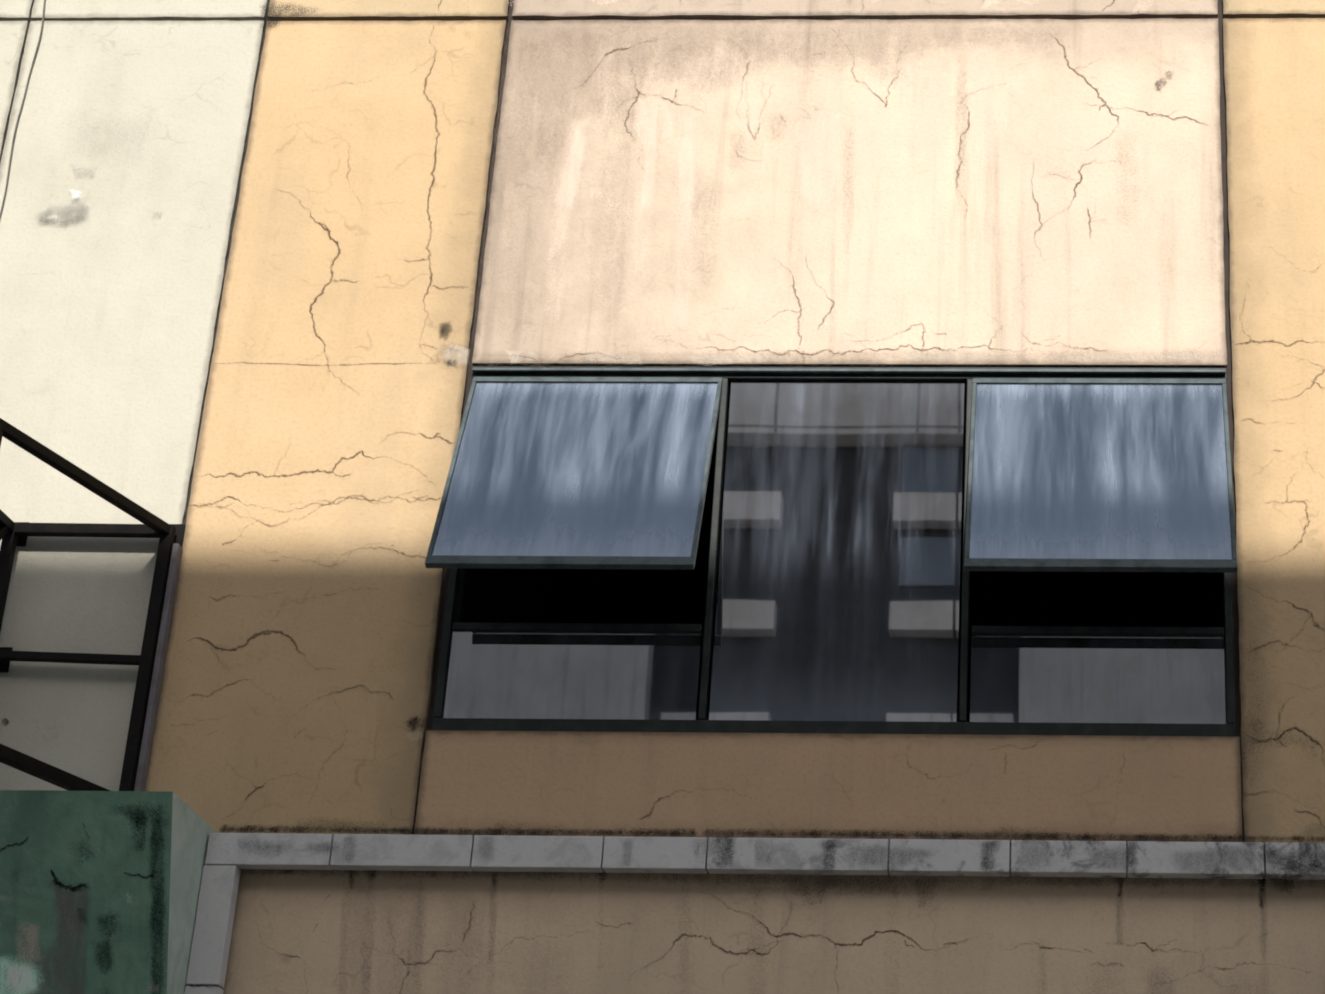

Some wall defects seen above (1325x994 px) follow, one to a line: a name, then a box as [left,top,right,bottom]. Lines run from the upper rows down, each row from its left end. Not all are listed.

crack [214,2,467,394]
crack [575,39,699,162]
leakage [470,0,1080,353]
crack [955,84,1002,216]
crack [1031,35,1210,257]
crack [663,254,1102,364]
crack [1238,292,1325,653]
crack [183,432,452,819]
crack [1244,695,1324,762]
crack [387,904,633,991]
leakage [219,817,1325,994]
crack [632,893,975,994]